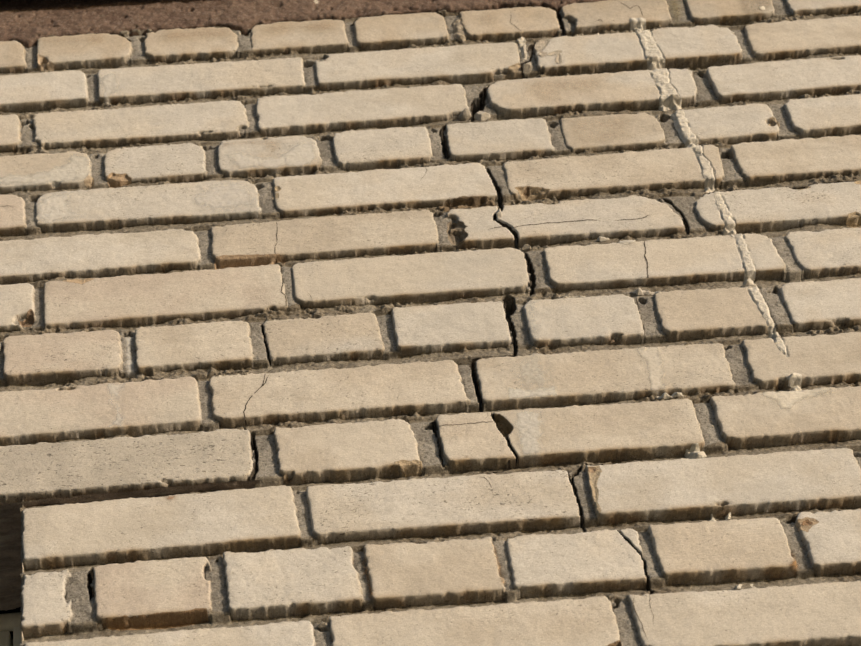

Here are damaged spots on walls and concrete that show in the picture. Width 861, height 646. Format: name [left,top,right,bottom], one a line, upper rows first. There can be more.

crack [510,6,565,79]
crack [439,86,489,158]
crack [663,199,689,235]
damp [629,18,789,357]
crack [434,168,592,488]
spalling [494,413,514,442]
crack [568,464,603,533]
crack [617,530,654,637]